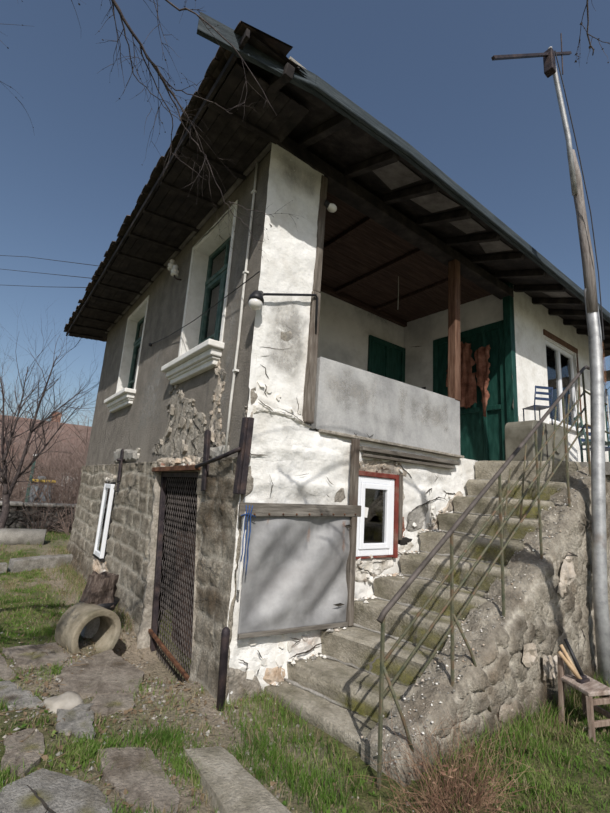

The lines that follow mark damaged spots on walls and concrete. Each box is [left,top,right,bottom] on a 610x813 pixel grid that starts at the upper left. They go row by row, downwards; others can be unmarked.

spalling [152,360,230,467]
spalling [355,491,463,583]
peeling [227,630,322,703]
crack [22,784,56,813]